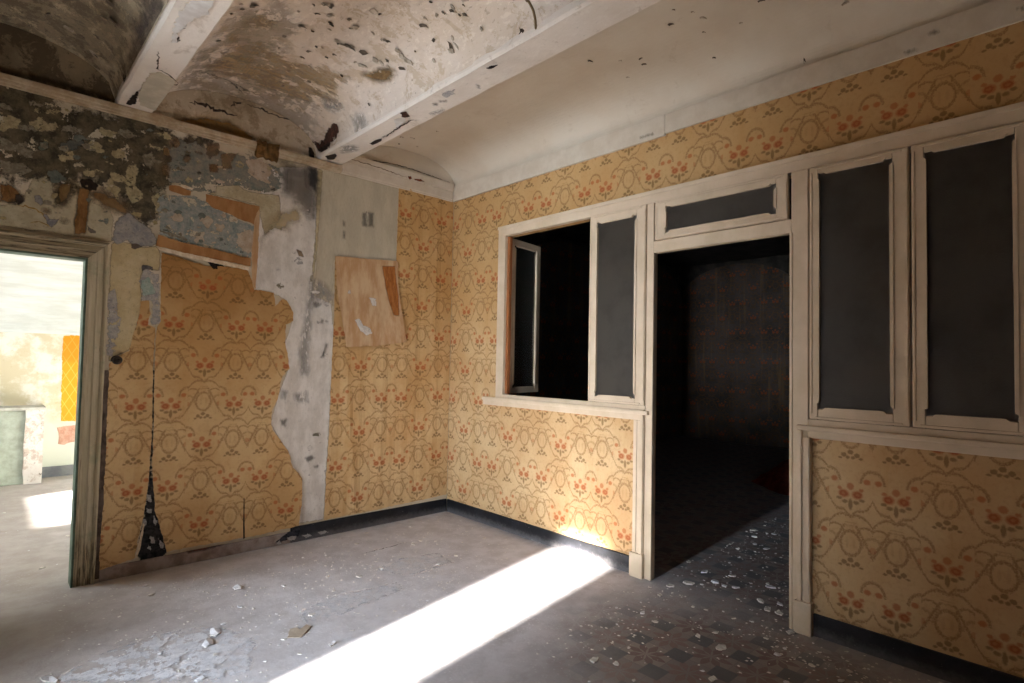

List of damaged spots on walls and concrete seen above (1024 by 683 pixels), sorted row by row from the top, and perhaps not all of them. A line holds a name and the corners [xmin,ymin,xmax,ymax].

crack [156,28,289,120]
peeling [300,2,416,73]
peeling [419,0,469,54]
damp [0,85,255,227]
spalling [370,111,418,147]
flaking render [0,100,399,545]